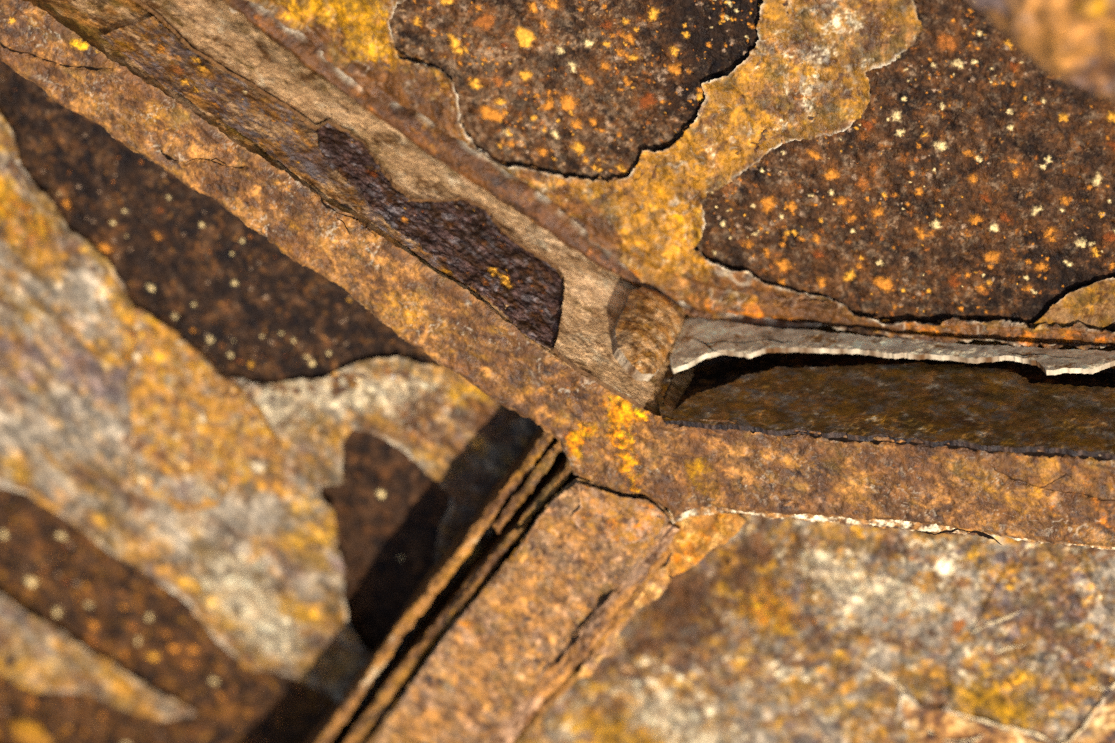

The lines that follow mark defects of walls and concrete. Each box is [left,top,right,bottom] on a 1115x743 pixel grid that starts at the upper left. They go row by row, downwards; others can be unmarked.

peeling [0,60,441,513]
peeling [383,0,764,202]
corrosion [220,0,1115,348]
peeling [669,0,1115,409]
peeling [0,475,339,743]
corrosion [0,112,541,729]
peeling [321,429,451,654]
corrosion [555,396,647,492]
corrosion [686,461,704,477]
corrosion [525,514,1115,743]
crack [785,432,1115,501]
crack [915,529,1001,545]